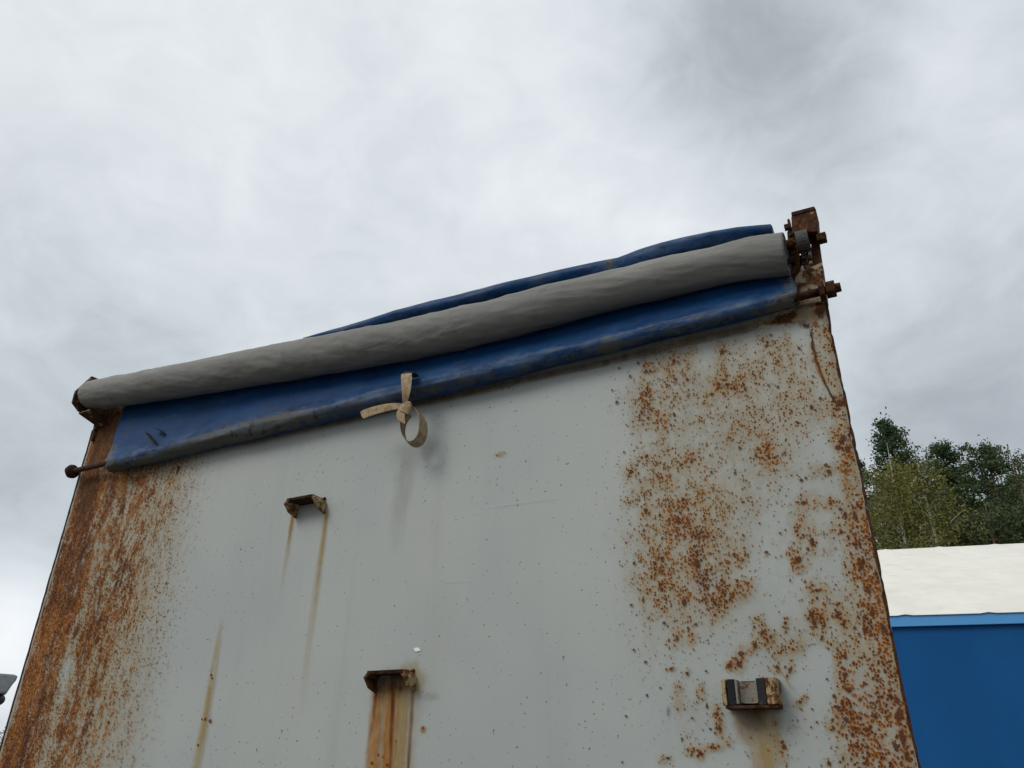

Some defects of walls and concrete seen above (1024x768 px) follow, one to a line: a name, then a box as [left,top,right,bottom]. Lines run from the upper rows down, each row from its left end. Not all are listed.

rust [0,406,220,768]
rust [368,675,425,768]
rust [605,302,921,768]